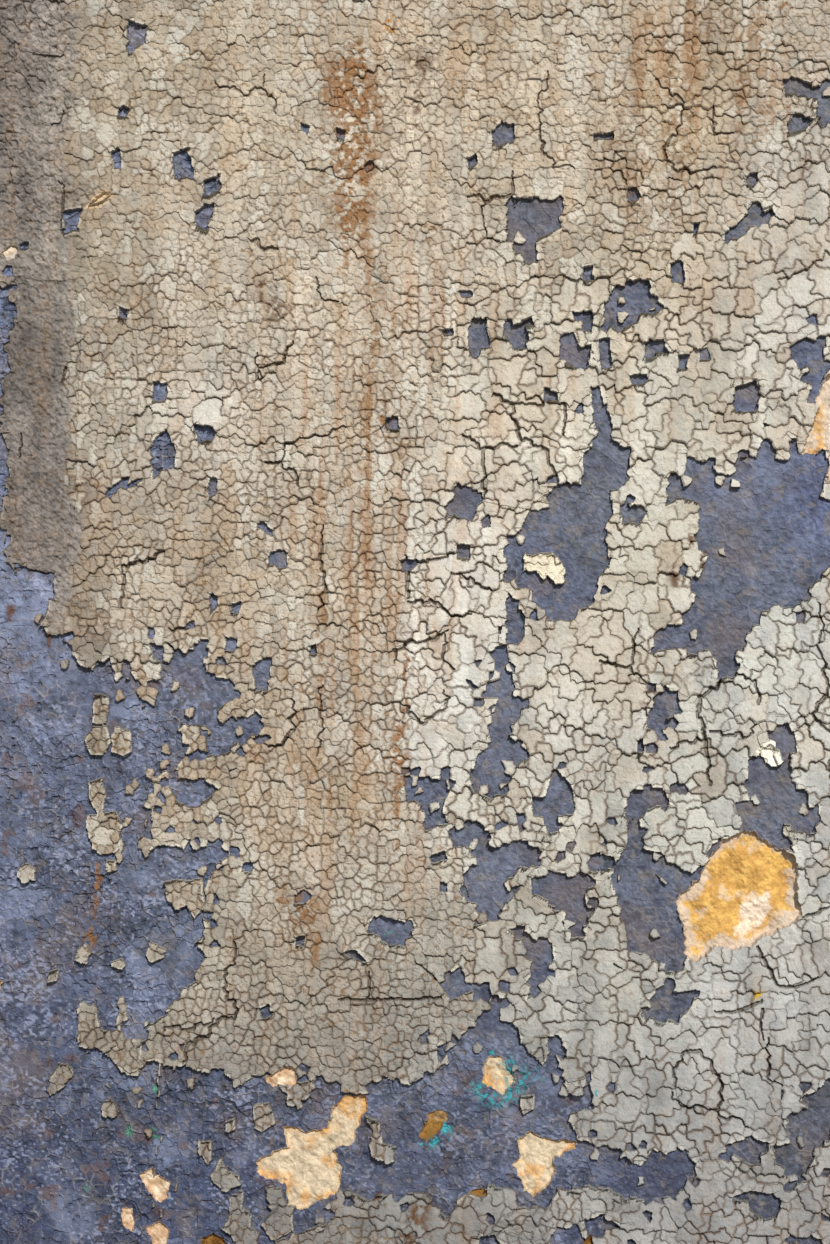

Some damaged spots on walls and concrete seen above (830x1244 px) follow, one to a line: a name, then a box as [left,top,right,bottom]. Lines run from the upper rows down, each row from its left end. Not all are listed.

corrosion [325,41,381,266]
peeling [499,197,564,268]
peeling [721,170,779,244]
crack [462,392,567,499]
peeling [648,315,830,682]
crack [392,552,493,726]
peeling [0,239,714,1244]
crack [669,673,762,787]
spalling [398,721,822,1028]
crack [714,945,818,1086]
crack [671,1049,747,1128]
peeling [717,1079,830,1219]